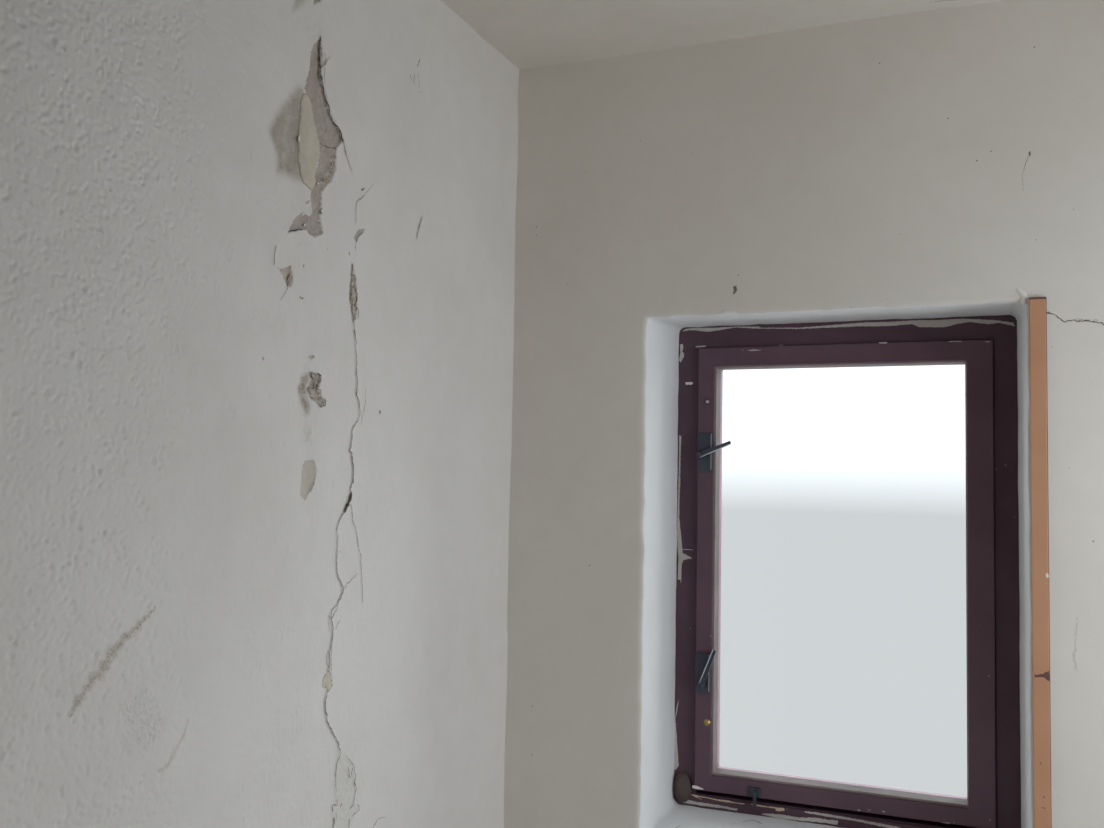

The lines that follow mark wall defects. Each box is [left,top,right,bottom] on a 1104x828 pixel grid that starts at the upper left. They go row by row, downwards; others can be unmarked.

spalling [288,39,342,237]
crack [354,186,372,250]
spalling [274,246,304,300]
spalling [349,253,359,323]
crack [1047,312,1104,325]
spalling [307,355,326,407]
spalling [300,459,317,500]
crack [325,327,366,755]